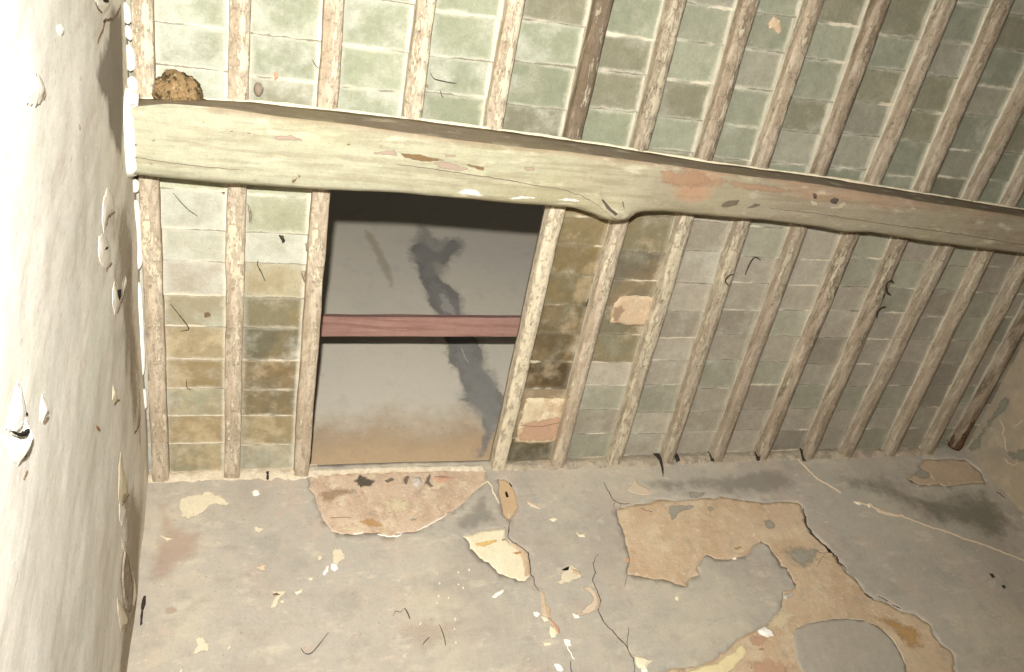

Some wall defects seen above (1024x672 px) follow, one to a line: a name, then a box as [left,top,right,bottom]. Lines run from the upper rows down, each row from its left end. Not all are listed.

flaking render [98,188,115,271]
flaking render [112,277,127,316]
flaking render [610,295,652,326]
flaking render [515,398,564,444]
flaking render [309,464,541,598]
crack [592,557,653,672]
flaking render [617,479,955,672]
crack [802,508,903,609]